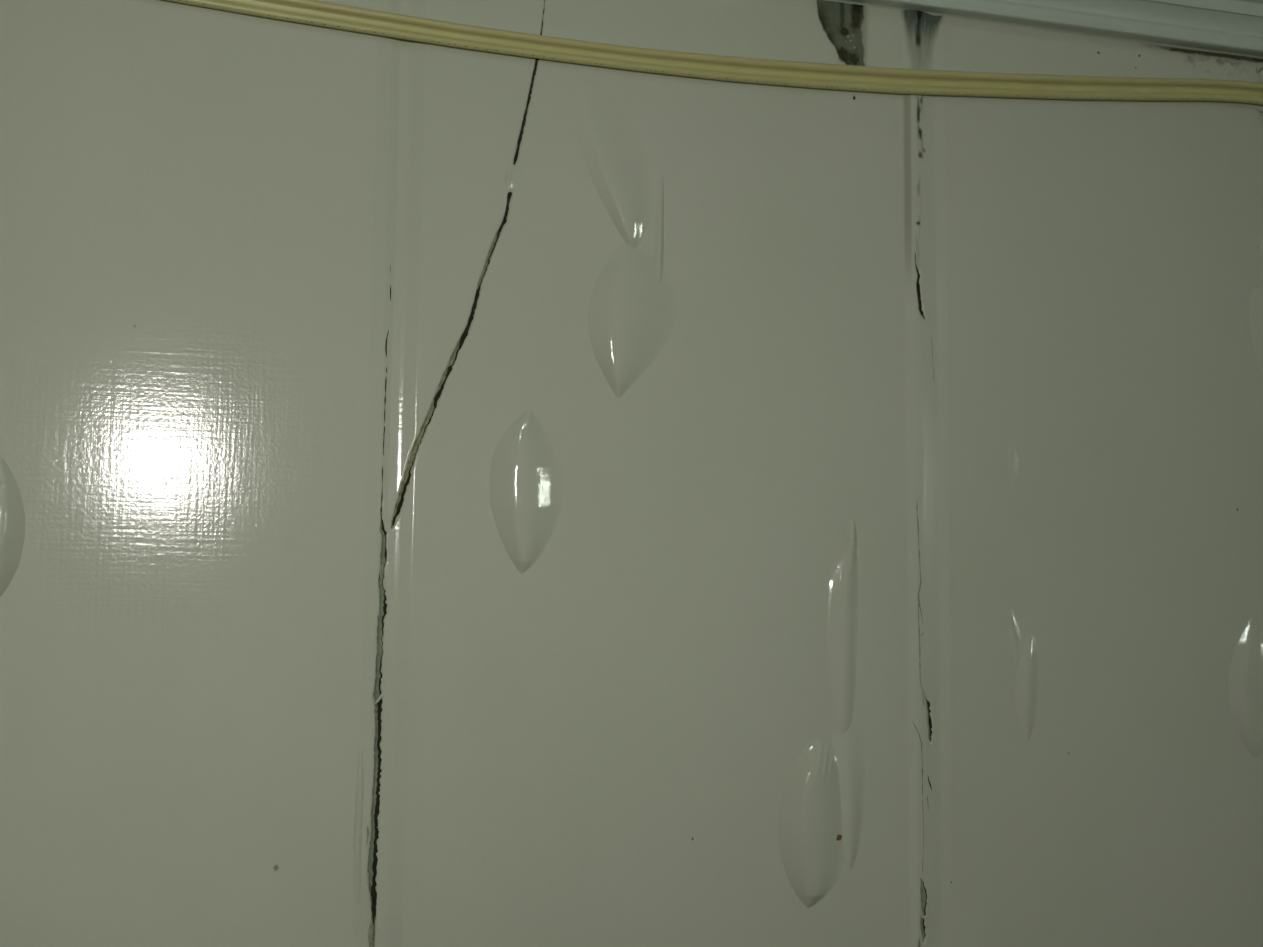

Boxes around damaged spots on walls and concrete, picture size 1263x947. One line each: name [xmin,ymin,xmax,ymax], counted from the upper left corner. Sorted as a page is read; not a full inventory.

crack [366,0,546,947]
crack [915,253,934,382]
crack [912,504,932,947]